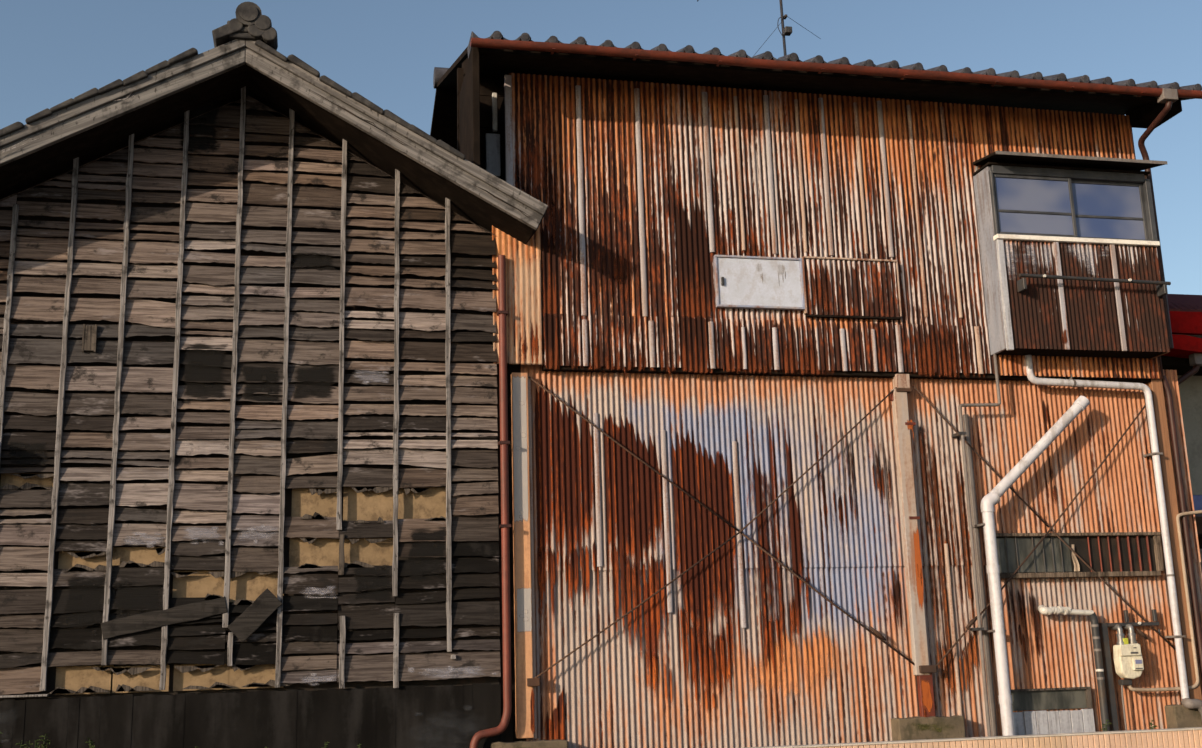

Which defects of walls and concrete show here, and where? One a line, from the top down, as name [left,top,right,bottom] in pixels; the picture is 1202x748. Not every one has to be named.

rust [906,324,985,377]
rust [516,143,832,723]
flaking render [0,473,54,489]
flaking render [291,486,446,523]
flaking render [58,537,393,605]
rust [890,570,903,628]
rust [907,419,978,717]
rust [1009,581,1042,661]
flaking render [48,663,289,695]